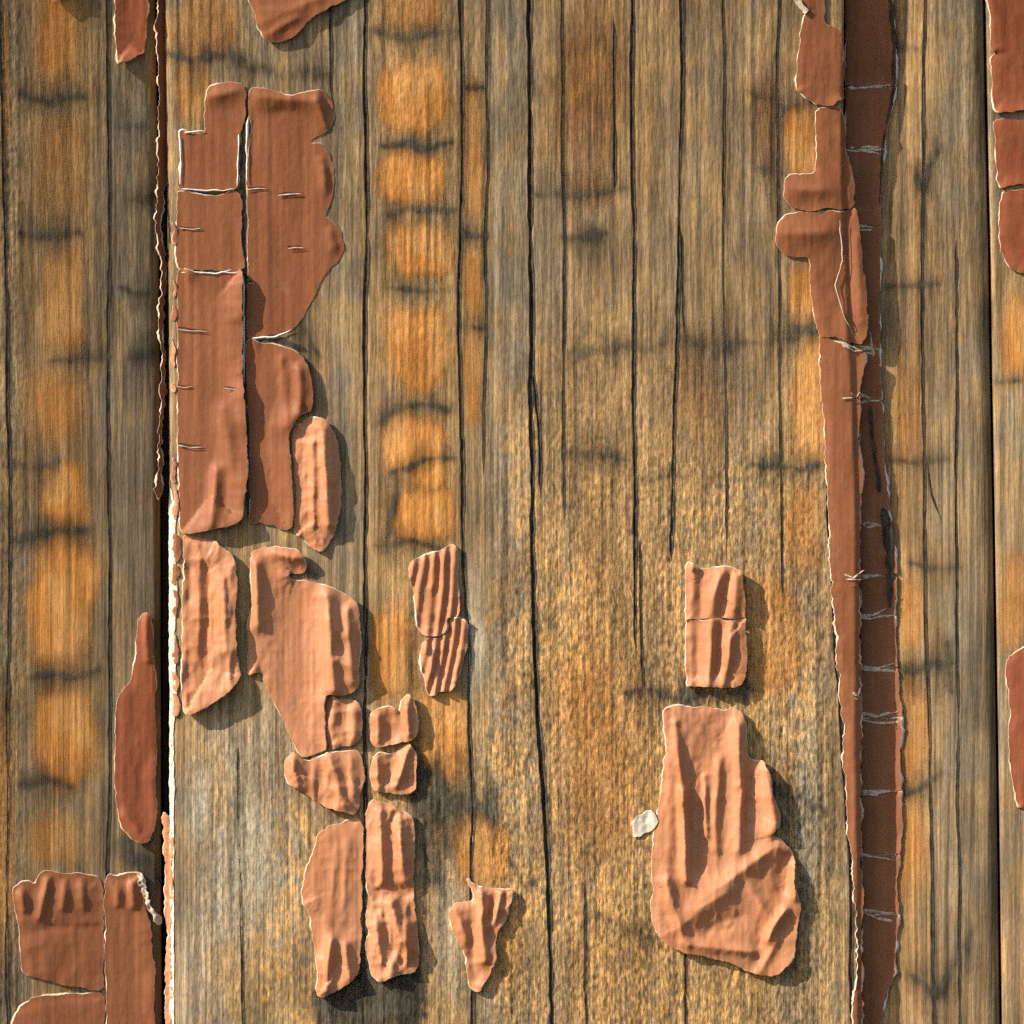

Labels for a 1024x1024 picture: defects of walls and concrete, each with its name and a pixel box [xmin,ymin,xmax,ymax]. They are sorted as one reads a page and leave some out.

peeling [11,0,420,1024]
peeling [408,544,469,697]
crack [468,989,476,1024]
crack [457,0,489,901]
peeling [449,878,514,992]
crack [526,0,566,1024]
crack [613,0,644,694]
crack [669,0,685,562]
peeling [684,561,748,689]
peeling [631,704,801,977]
peeling [775,0,905,1024]
peeling [985,0,1024,273]